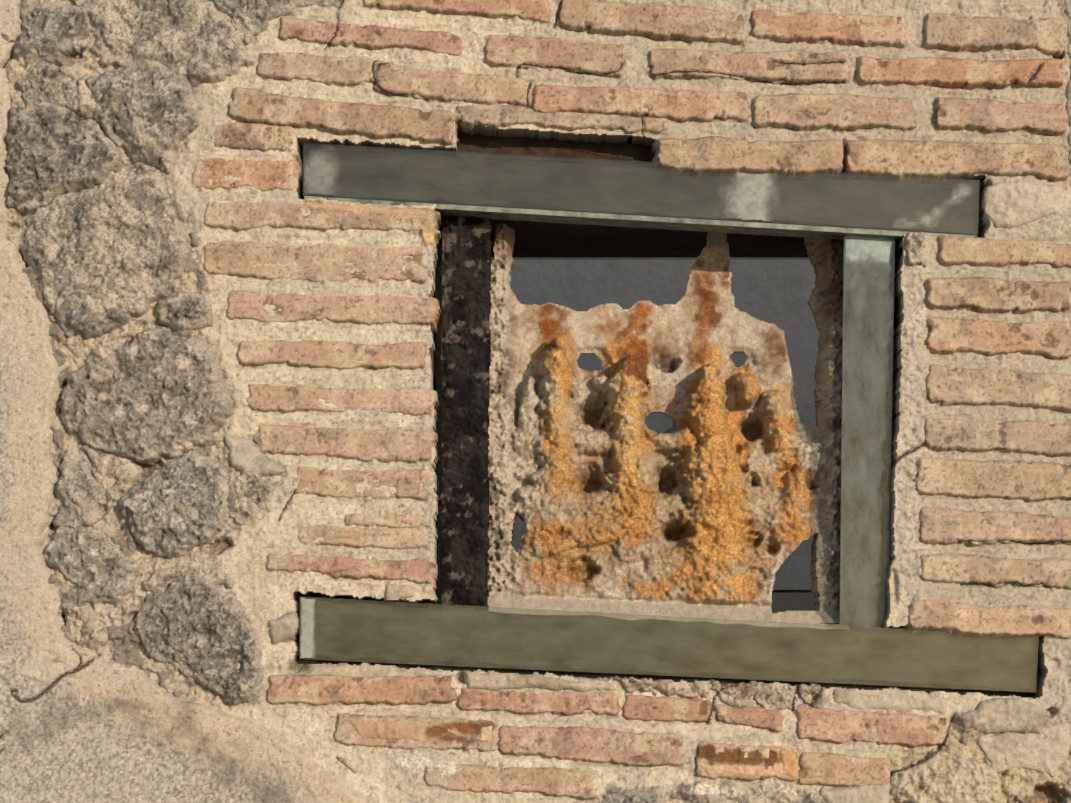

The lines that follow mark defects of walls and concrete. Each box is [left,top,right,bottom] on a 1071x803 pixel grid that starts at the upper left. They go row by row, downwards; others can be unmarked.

rust [519,260,813,603]
crack [10,656,97,703]
peeling [19,616,93,683]